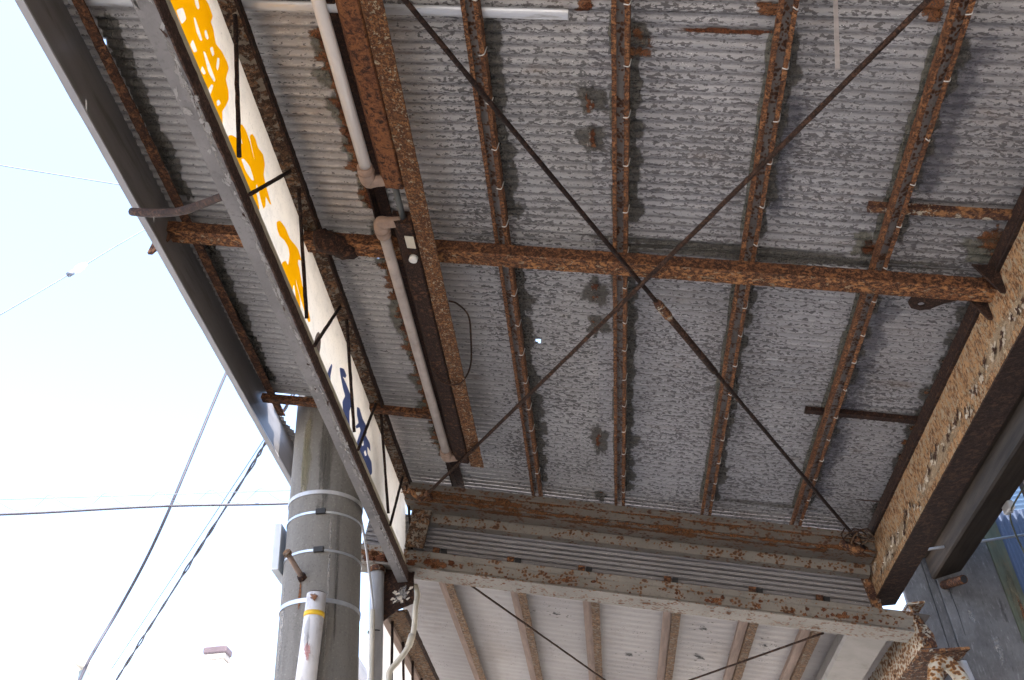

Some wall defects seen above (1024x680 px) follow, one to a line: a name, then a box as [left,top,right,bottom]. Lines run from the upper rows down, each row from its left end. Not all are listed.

rust [757,2,778,16]
rust [683,27,773,35]
rust [308,27,372,209]
rust [376,261,441,456]
peeling [874,290,1024,586]
rust [401,489,878,558]
rust [406,556,463,579]
rust [704,595,763,620]
rust [790,607,898,637]